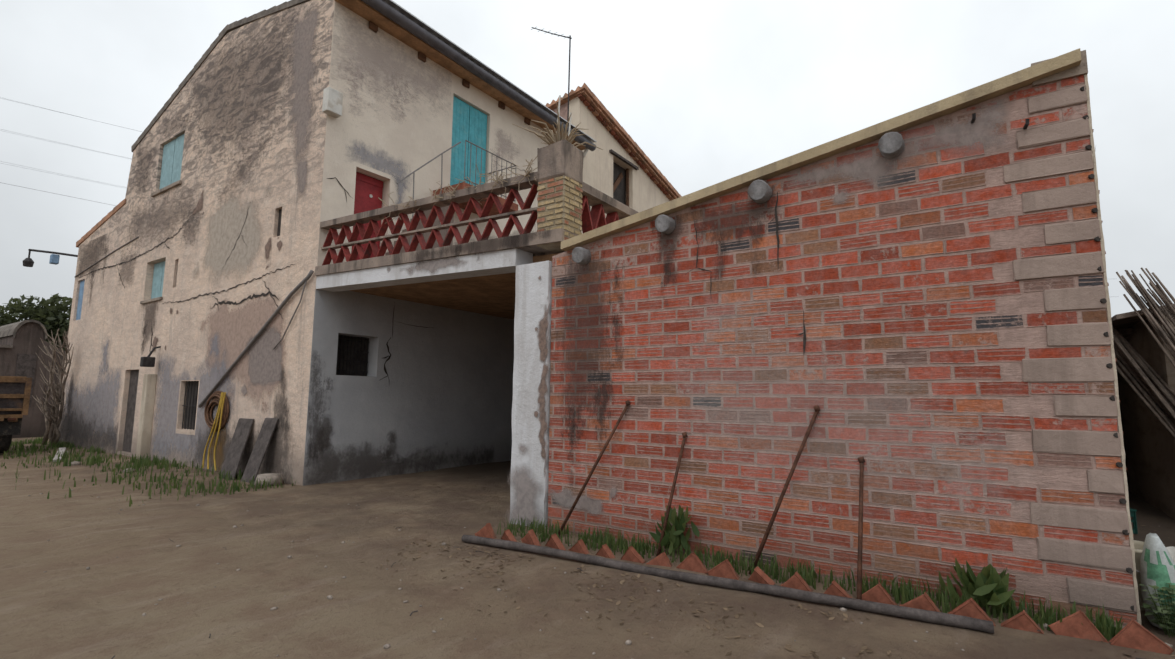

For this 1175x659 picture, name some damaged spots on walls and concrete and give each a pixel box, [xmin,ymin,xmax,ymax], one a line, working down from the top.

crack [79,215,192,288]
crack [149,206,295,351]
crack [379,304,432,381]
damp [309,420,493,484]